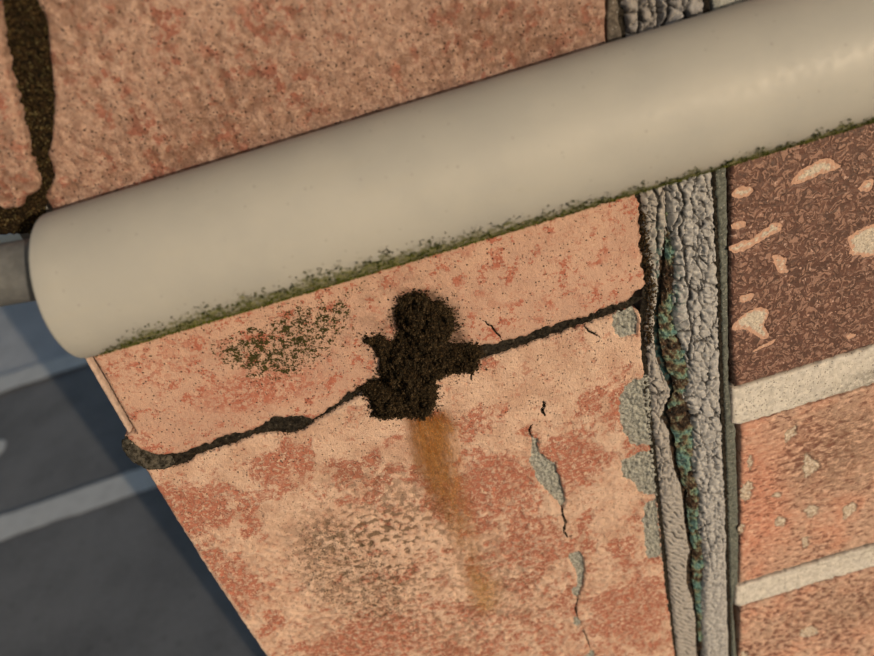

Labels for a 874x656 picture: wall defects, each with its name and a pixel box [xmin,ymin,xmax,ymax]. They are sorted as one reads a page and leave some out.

crack [0,0,55,235]
spalling [611,306,637,337]
crack [121,376,385,471]
rust [409,412,462,521]
crack [470,212,704,656]
spalling [618,375,662,558]